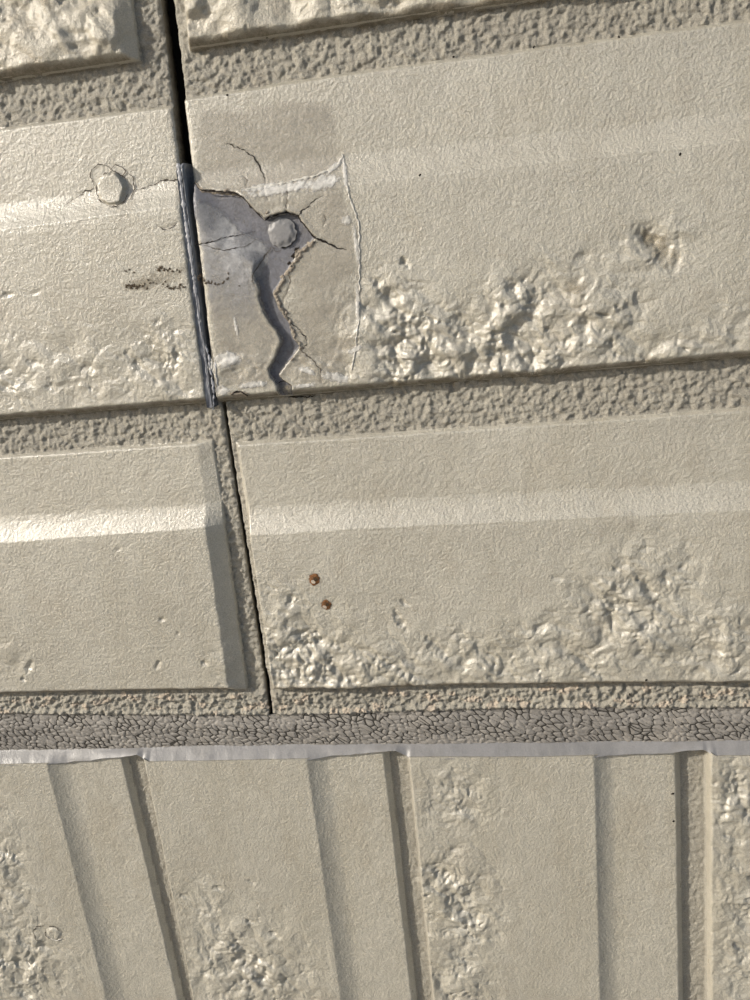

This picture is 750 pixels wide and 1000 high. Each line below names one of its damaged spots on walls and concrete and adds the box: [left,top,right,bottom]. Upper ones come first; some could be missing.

crack [227,143,347,250]
spalling [193,180,315,398]
crack [0,707,750,750]